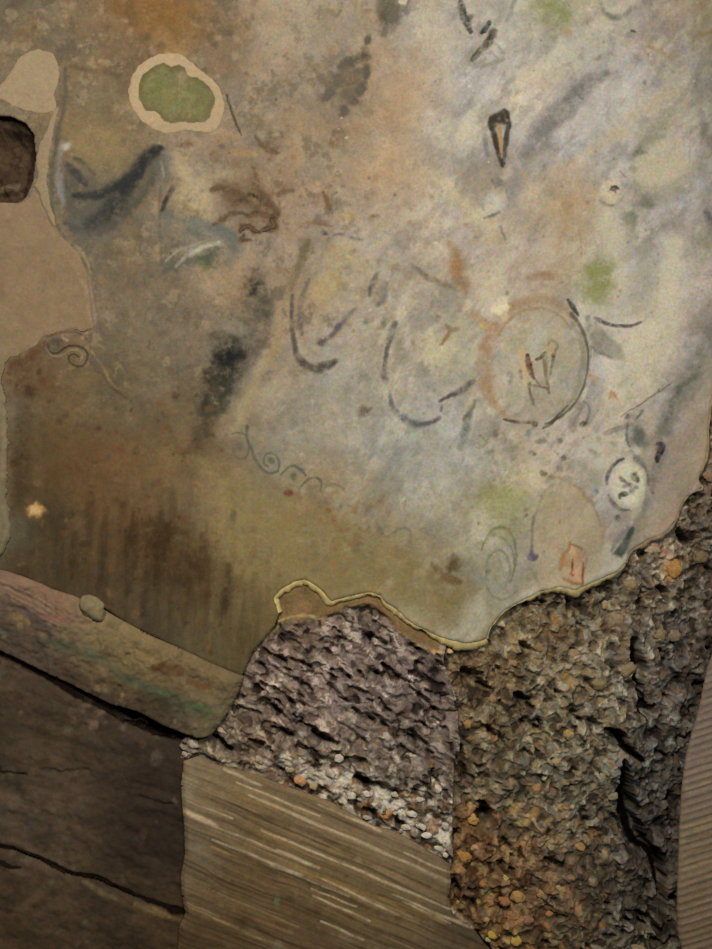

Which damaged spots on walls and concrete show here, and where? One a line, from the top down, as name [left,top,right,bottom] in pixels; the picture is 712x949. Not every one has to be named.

water stain [141,63,215,122]
crack [0,651,177,738]
spalling [179,399,712,949]
crack [629,636,648,721]
crack [605,727,658,892]
crack [0,844,185,914]